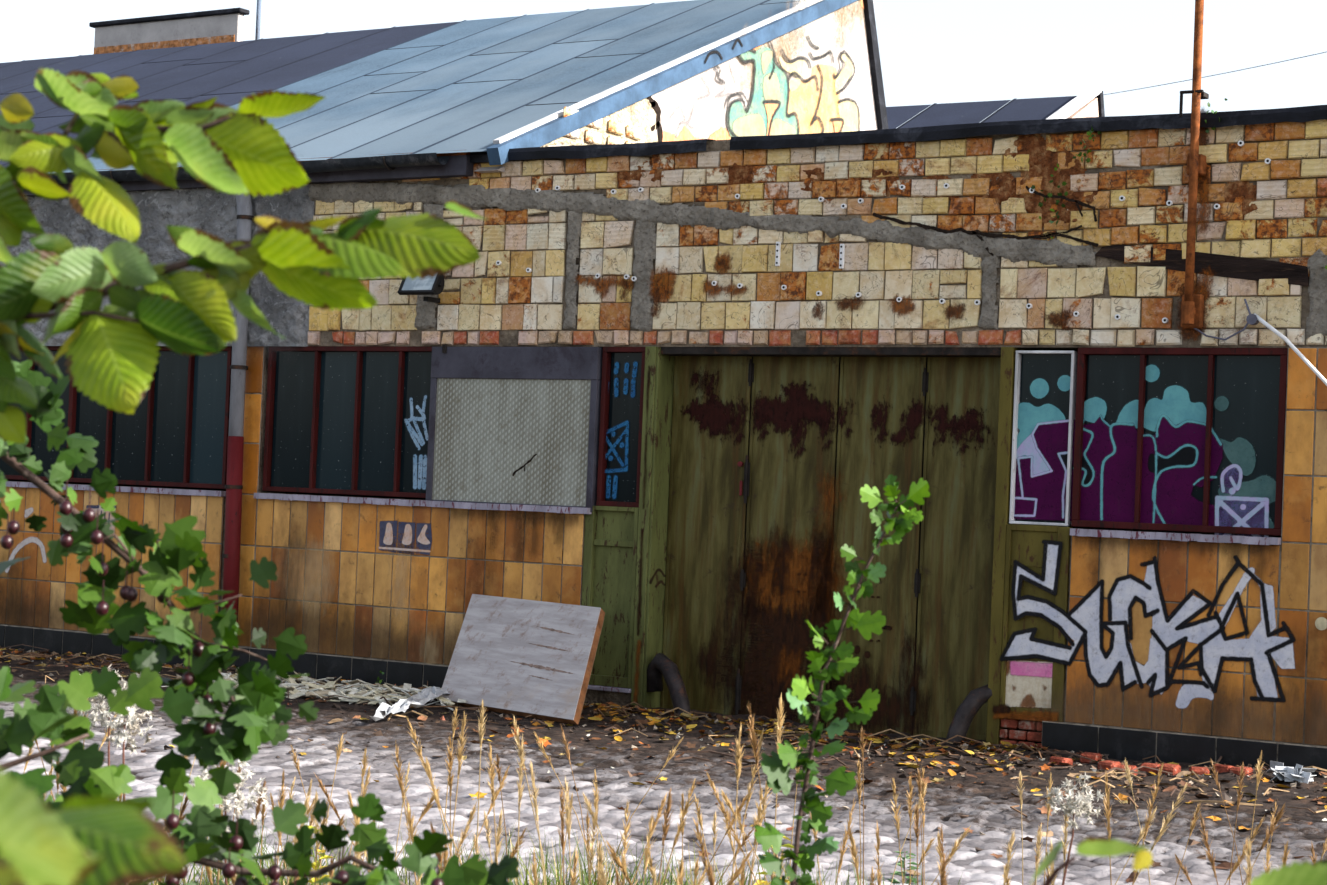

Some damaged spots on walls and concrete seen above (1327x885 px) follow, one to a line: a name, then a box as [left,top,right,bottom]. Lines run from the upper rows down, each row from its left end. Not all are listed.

crack [647,95,663,142]
rust [1186,109,1211,233]
rust [575,274,633,301]
rust [650,268,676,318]
rust [703,252,748,298]
rust [812,296,866,320]
rust [891,295,915,315]
rust [944,303,965,319]
rust [1176,266,1214,341]
rust [681,367,853,458]
rust [870,394,995,456]
rust [731,478,929,735]